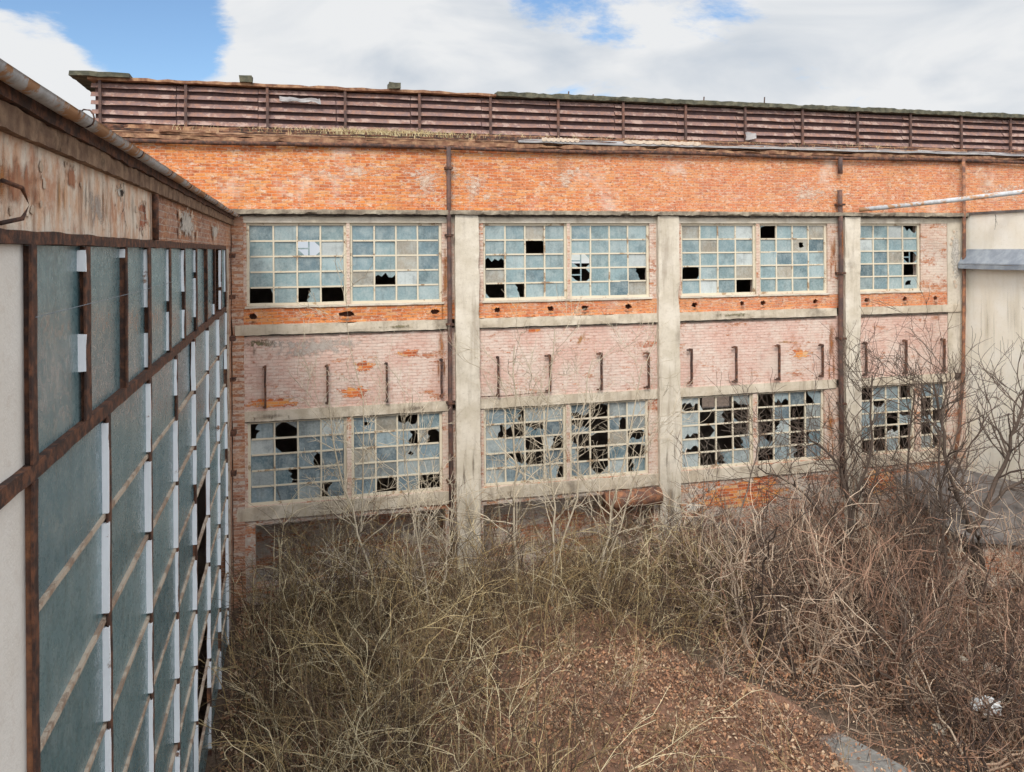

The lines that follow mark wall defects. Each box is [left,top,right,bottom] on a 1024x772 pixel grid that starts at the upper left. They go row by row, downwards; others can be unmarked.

flaking render [178,207,198,239]
flaking render [337,360,375,400]